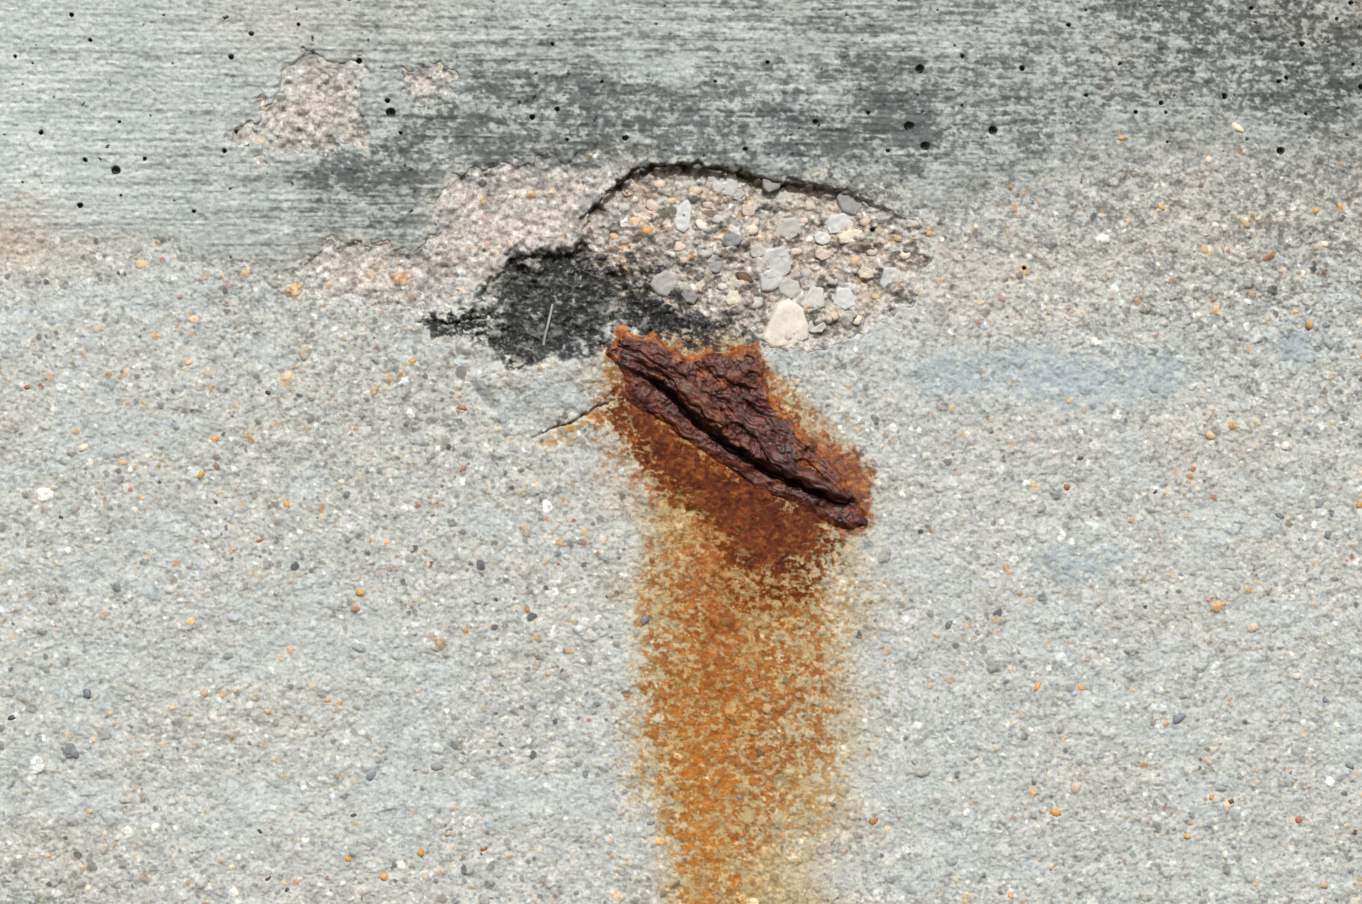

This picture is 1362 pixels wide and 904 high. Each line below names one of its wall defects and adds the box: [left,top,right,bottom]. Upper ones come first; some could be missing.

peeling [232,48,370,168]
damp [422,241,754,369]
spalling [296,153,933,353]
rust [548,325,876,904]